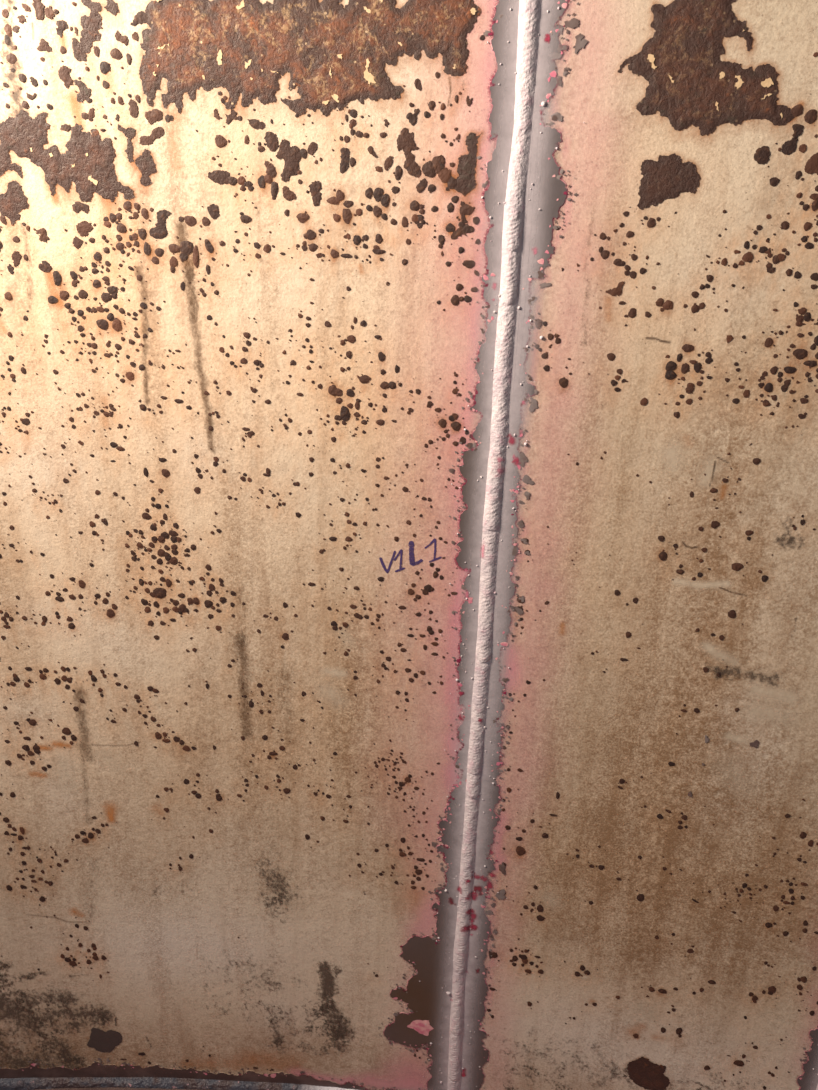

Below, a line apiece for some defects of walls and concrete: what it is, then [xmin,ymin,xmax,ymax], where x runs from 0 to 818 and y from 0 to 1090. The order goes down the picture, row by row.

rust [577,0,818,326]
rust [0,0,485,519]
rust [531,313,561,371]
rust [640,302,818,429]
rust [0,437,245,652]
rust [318,453,450,554]
rust [658,468,741,581]
rust [303,557,457,722]
rust [1,712,82,776]
rust [0,661,196,751]
rust [151,727,451,894]
rust [627,1057,670,1090]